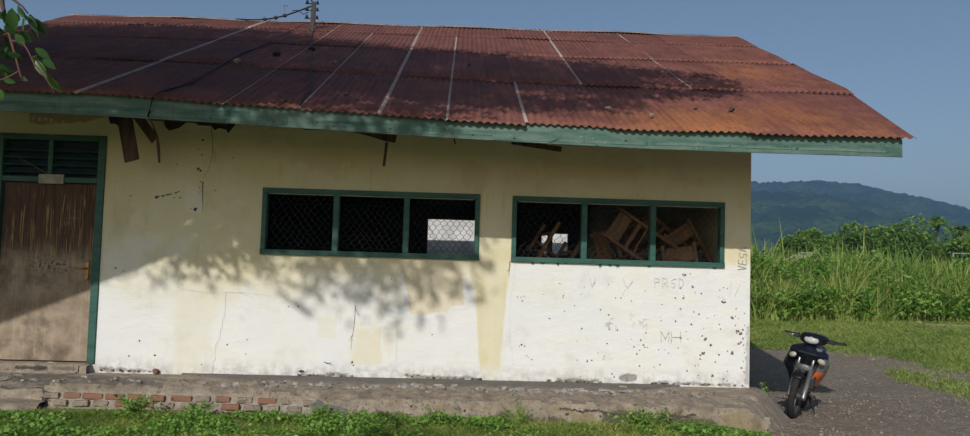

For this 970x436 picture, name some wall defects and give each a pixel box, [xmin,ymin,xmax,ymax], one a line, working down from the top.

peeling [0,256,749,418]